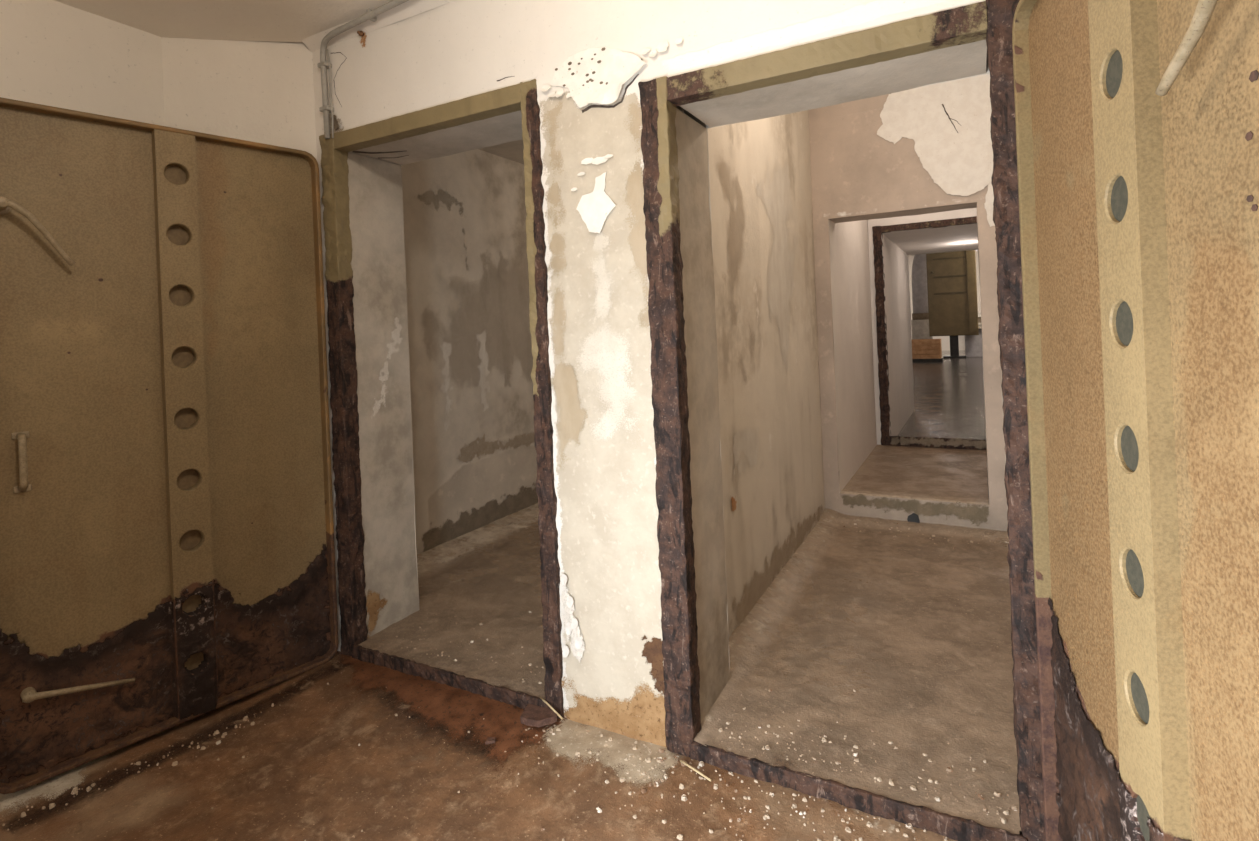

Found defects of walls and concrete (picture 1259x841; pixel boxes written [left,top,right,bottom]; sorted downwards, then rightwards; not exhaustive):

peeling [877,74,995,227]
leakage [417,188,533,431]
leakage [421,483,538,552]
leakage [456,432,535,463]
flaking render [539,37,683,741]
corrosion [0,544,667,810]
corrosion [1048,598,1187,841]